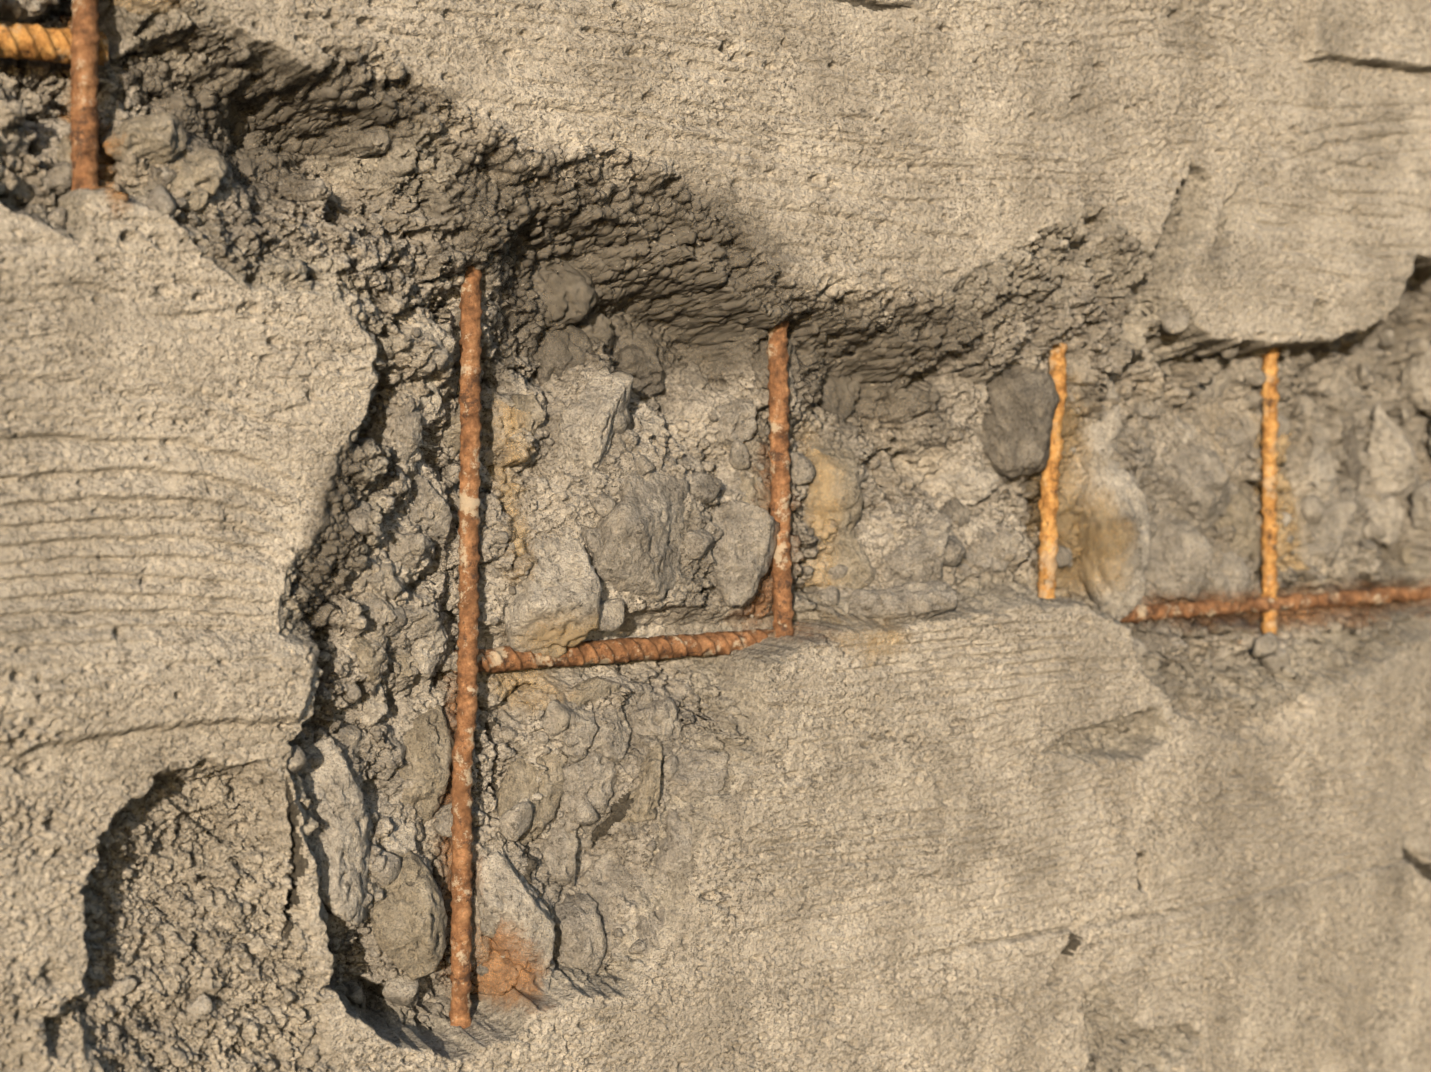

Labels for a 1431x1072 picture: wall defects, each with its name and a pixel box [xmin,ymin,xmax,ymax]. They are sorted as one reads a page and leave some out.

spalling [0,0,72,64]
spalling [70,0,100,192]
spalling [761,320,794,638]
spalling [1037,343,1068,599]
spalling [1260,347,1280,601]
spalling [449,265,483,1029]
spalling [477,628,774,673]
rust [741,562,774,627]
spalling [1120,585,1431,623]
rust [1152,585,1429,625]
rust [443,766,453,805]
rust [443,837,453,935]